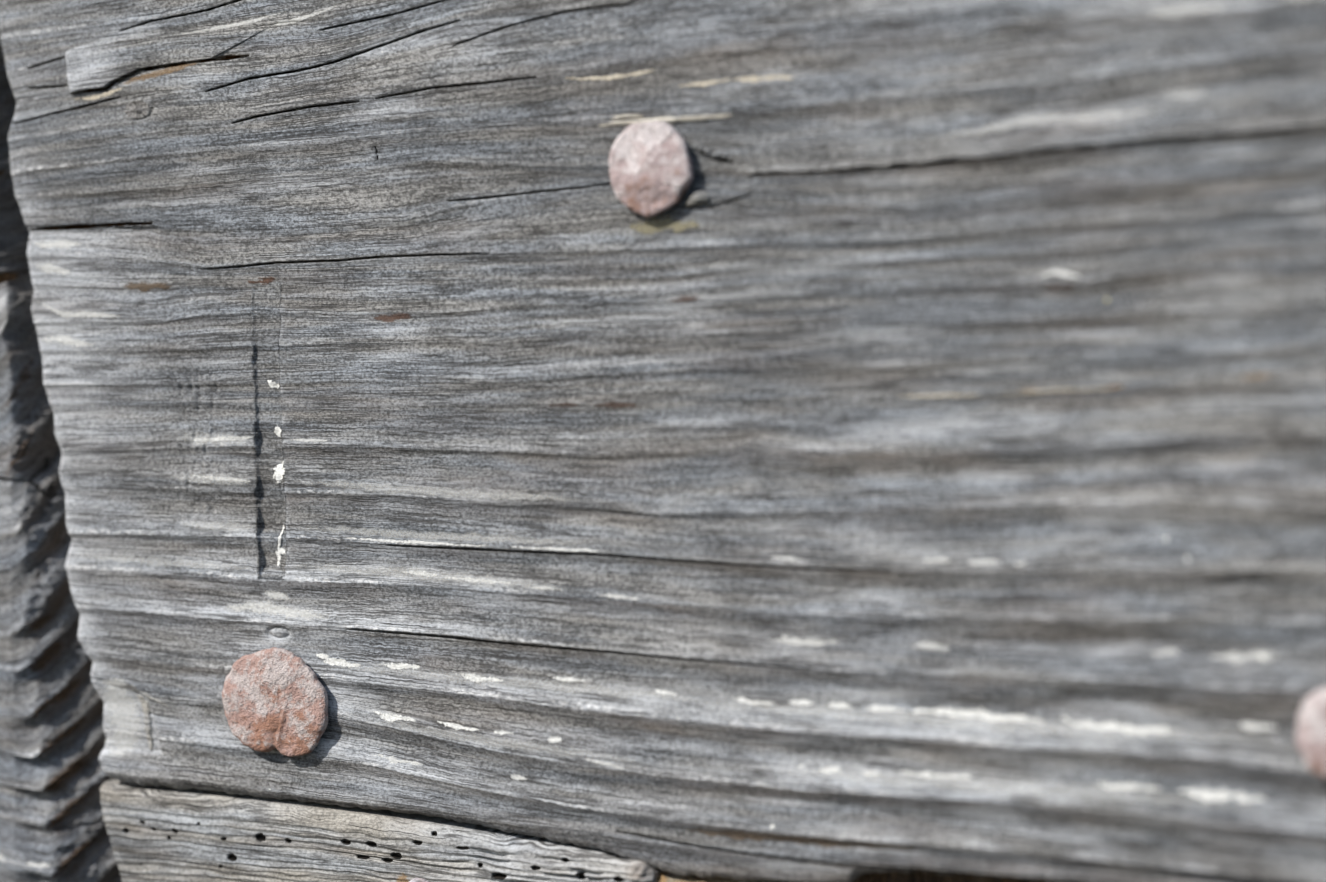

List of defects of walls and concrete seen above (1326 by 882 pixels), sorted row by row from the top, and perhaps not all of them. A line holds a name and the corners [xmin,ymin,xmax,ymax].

crack [14,0,636,124]
crack [450,184,607,201]
crack [30,222,152,231]
crack [0,457,64,497]